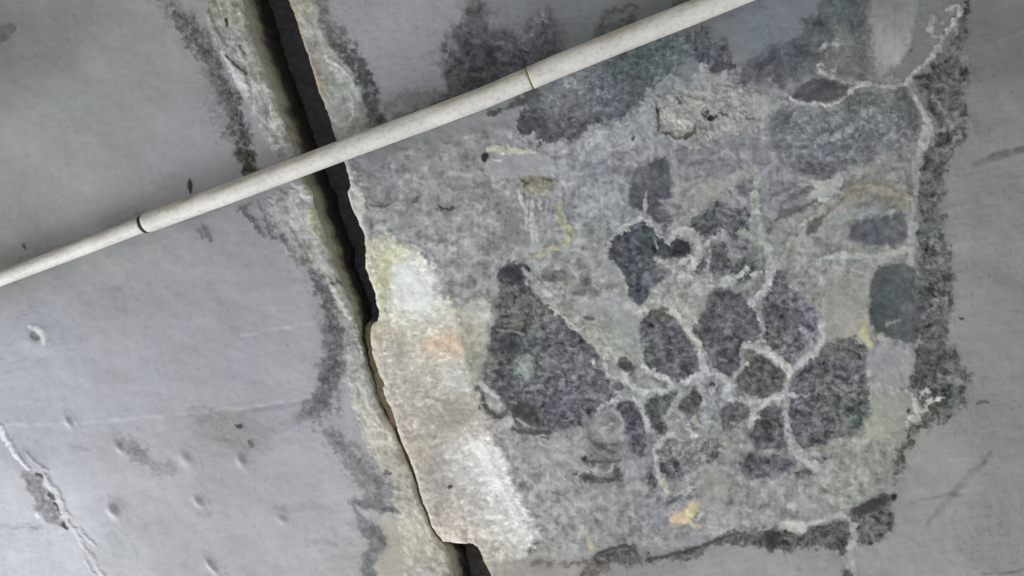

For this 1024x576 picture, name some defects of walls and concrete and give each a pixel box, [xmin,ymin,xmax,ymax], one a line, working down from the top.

water stain [153,0,262,177]
spalling [344,158,368,230]
peeling [480,143,576,182]
spalling [646,77,758,153]
crack [243,0,491,576]
water stain [186,0,990,576]
spalling [266,180,454,576]
crack [0,423,106,576]